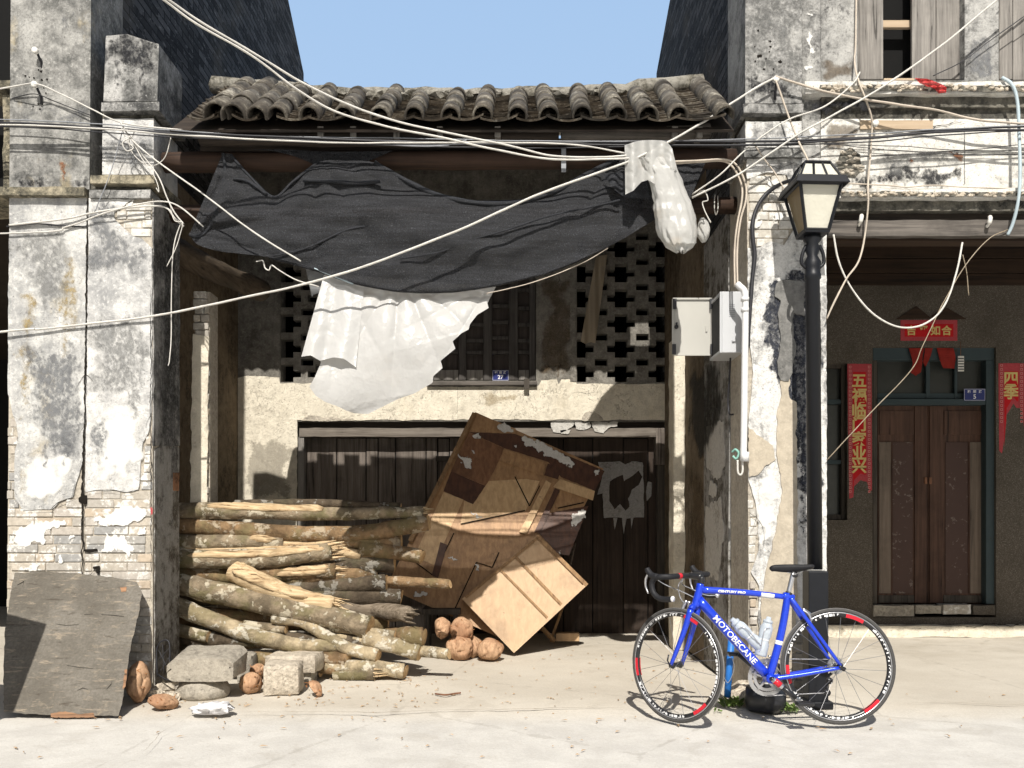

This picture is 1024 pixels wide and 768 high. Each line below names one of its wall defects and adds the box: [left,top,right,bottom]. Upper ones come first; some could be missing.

leakage [852,152,961,188]
leakage [18,203,179,499]
peeling [551,411,618,434]
leakage [688,363,721,459]
flaking render [7,419,153,697]
flaking render [748,500,757,562]